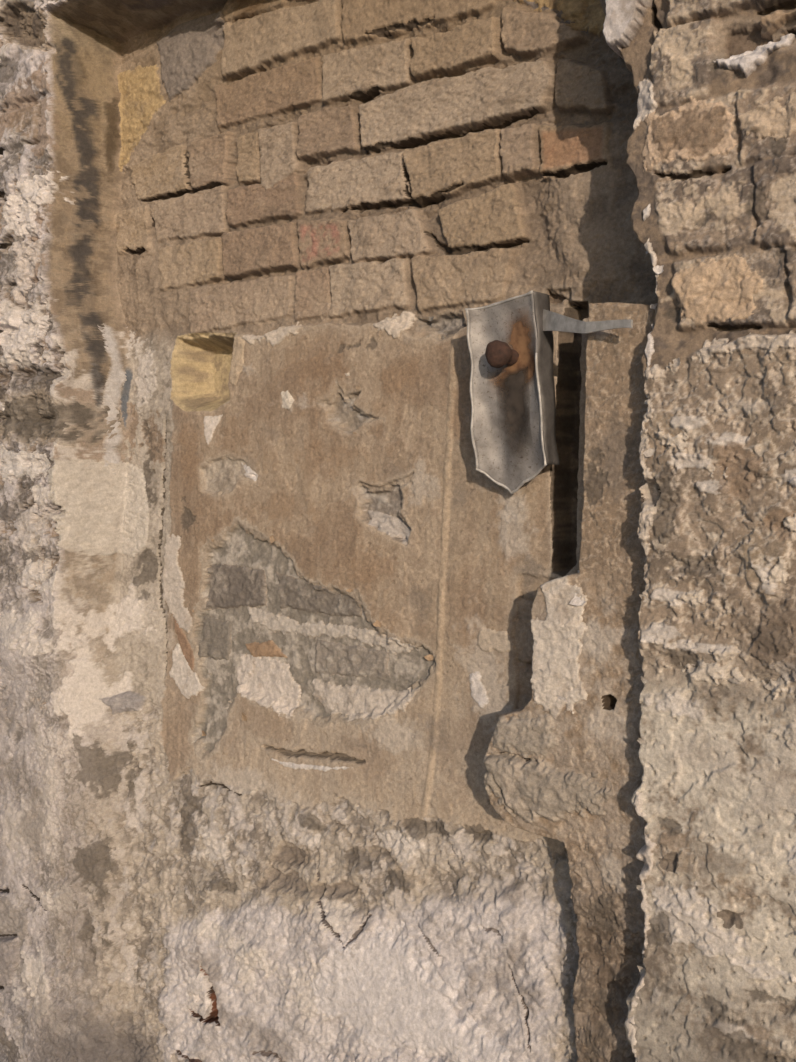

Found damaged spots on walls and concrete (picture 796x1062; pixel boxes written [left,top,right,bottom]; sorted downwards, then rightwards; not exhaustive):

flaking render [229,322,303,386]
flaking render [203,414,223,444]
flaking render [281,390,294,410]
spalling [316,372,384,434]
rust [494,318,535,454]
flaking render [0,388,149,558]
spalling [198,454,259,497]
spalling [351,471,414,547]
flaking render [161,516,438,761]
crack [264,745,365,772]
crack [0,884,47,911]